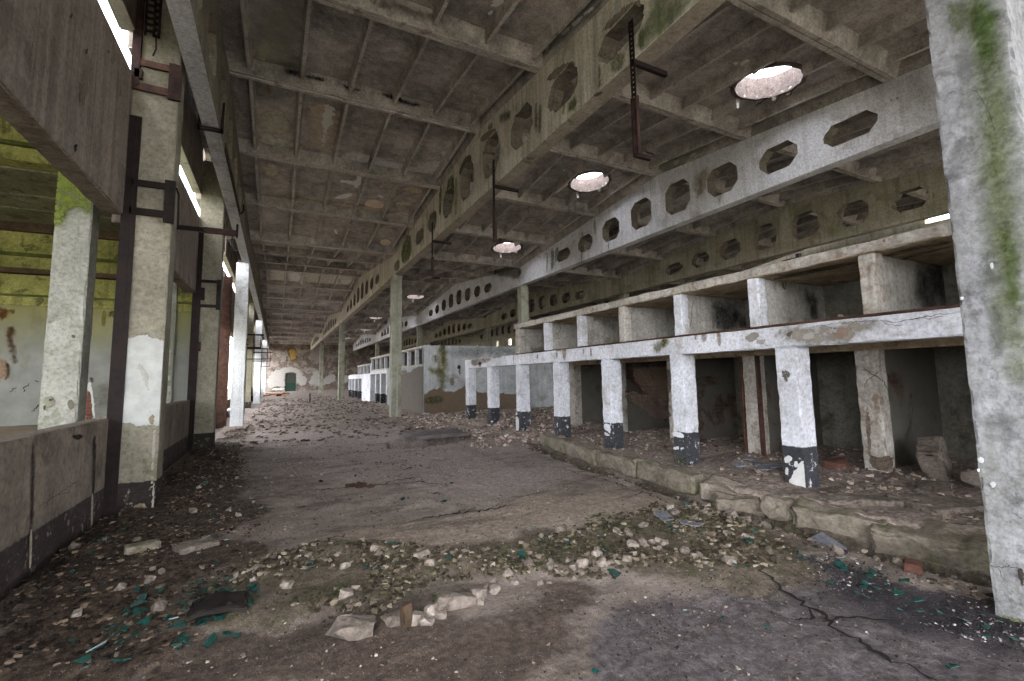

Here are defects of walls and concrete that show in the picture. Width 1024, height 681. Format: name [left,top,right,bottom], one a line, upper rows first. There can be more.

water stain [949,4,994,58]
water stain [1005,229,1018,302]
peeling [745,332,768,346]
peeling [779,321,874,344]
peeling [118,303,175,517]
peeling [784,455,806,488]
crack [753,563,939,681]